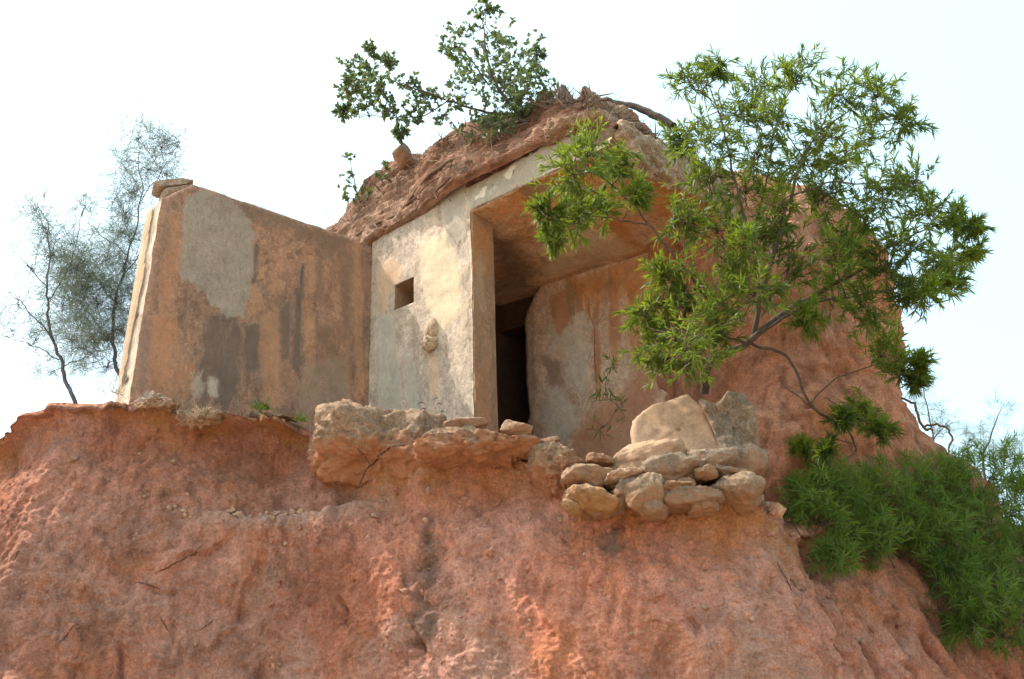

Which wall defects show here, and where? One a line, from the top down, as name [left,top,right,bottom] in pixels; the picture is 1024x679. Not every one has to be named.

damp [197,313,263,412]
peeling [177,188,318,320]
damp [218,193,351,412]
peeling [536,304,656,460]